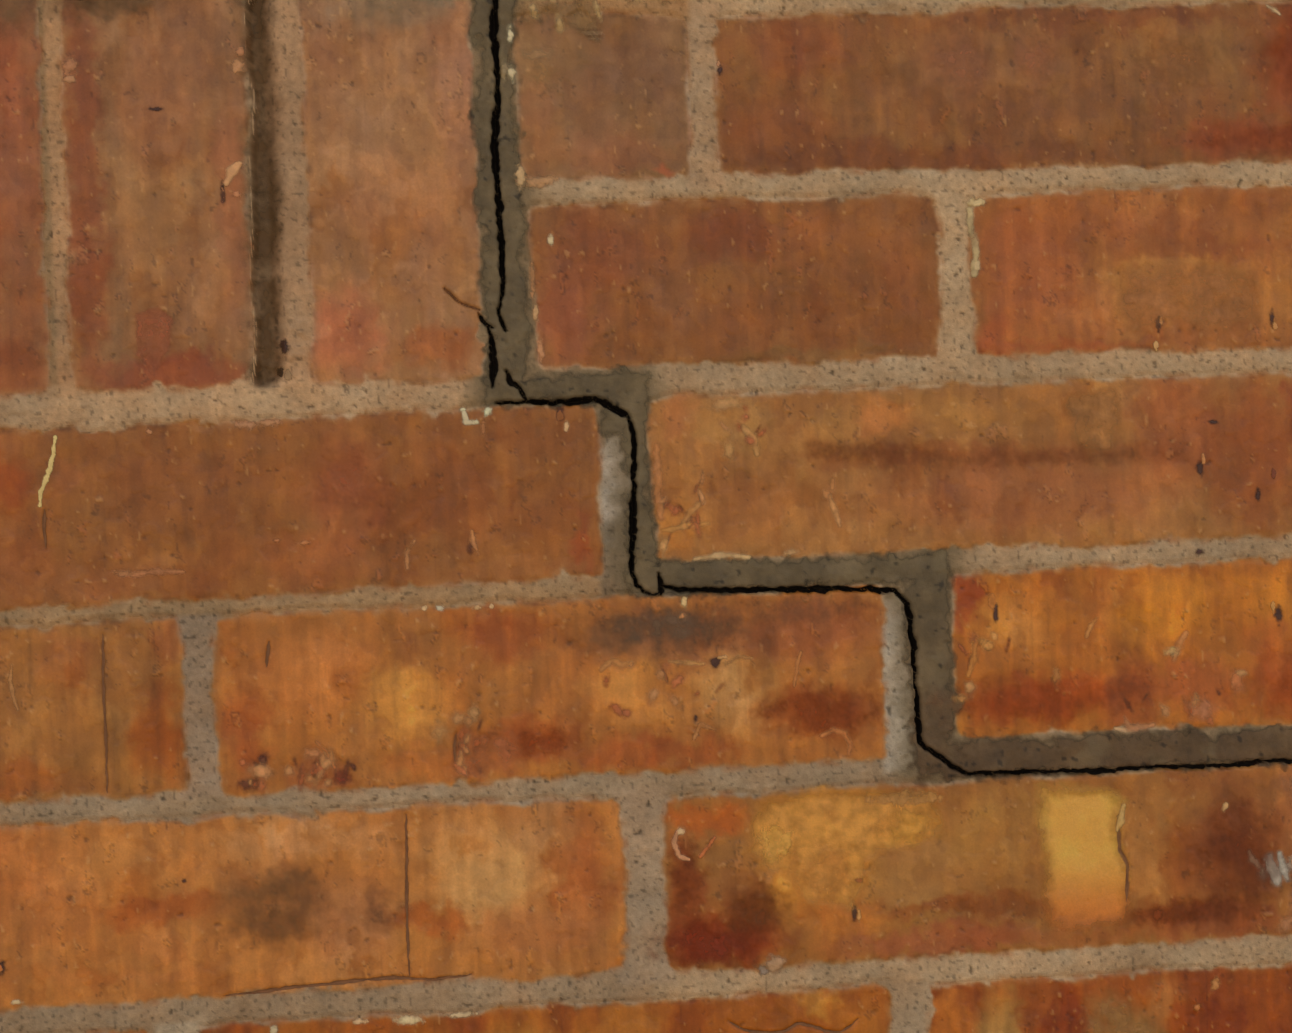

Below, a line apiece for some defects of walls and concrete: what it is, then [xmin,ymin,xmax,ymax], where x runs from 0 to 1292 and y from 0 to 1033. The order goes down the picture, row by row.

crack [444,0,1292,776]
crack [226,814,472,996]
crack [1117,828,1129,902]
crack [728,1018,859,1033]